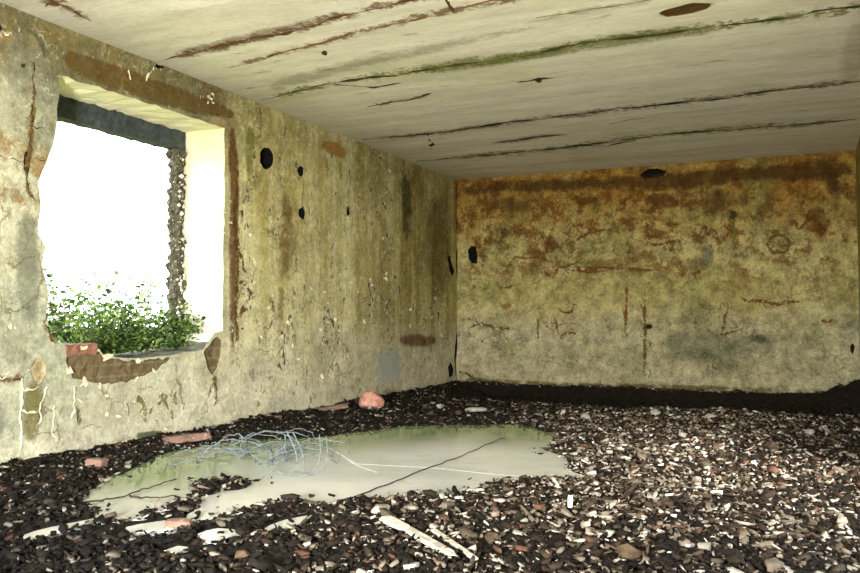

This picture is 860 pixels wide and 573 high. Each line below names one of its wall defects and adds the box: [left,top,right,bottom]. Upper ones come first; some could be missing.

crack [128,0,520,81]
crack [262,5,860,107]
crack [536,0,648,18]
crack [0,60,45,201]
crack [362,81,860,161]
corrosion [648,194,678,208]
peeling [222,169,447,389]
corrosion [545,233,561,252]
flaking render [65,343,187,438]
flaking render [204,337,222,377]
crack [208,374,218,406]